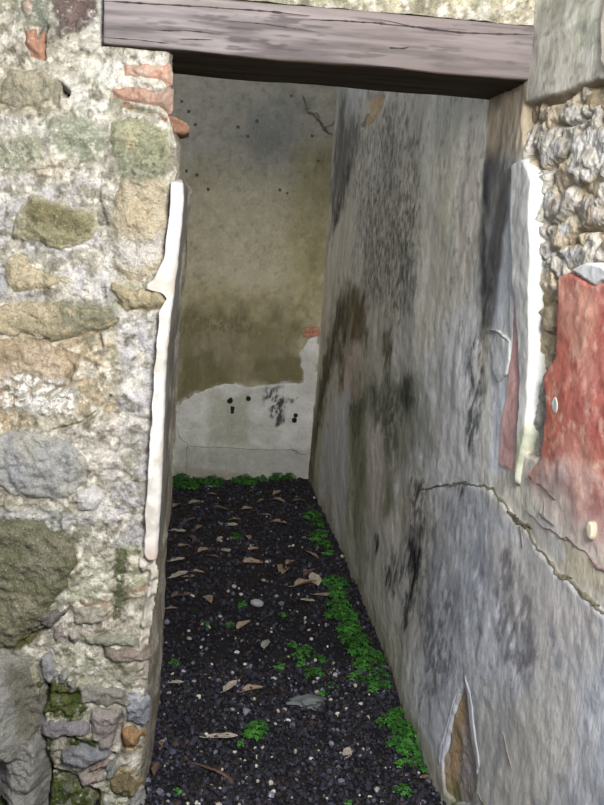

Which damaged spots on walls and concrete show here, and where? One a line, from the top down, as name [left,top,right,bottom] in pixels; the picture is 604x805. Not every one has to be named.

flaking render [138,169,319,651]
crack [302,95,335,135]
damp [308,295,349,480]
damp [330,99,420,304]
damp [349,331,413,515]
damp [466,339,485,452]
damp [479,156,513,332]
flaking render [498,87,604,540]
damp [385,477,453,697]
crack [421,481,604,614]
damp [496,549,536,674]
flaking render [437,675,480,803]